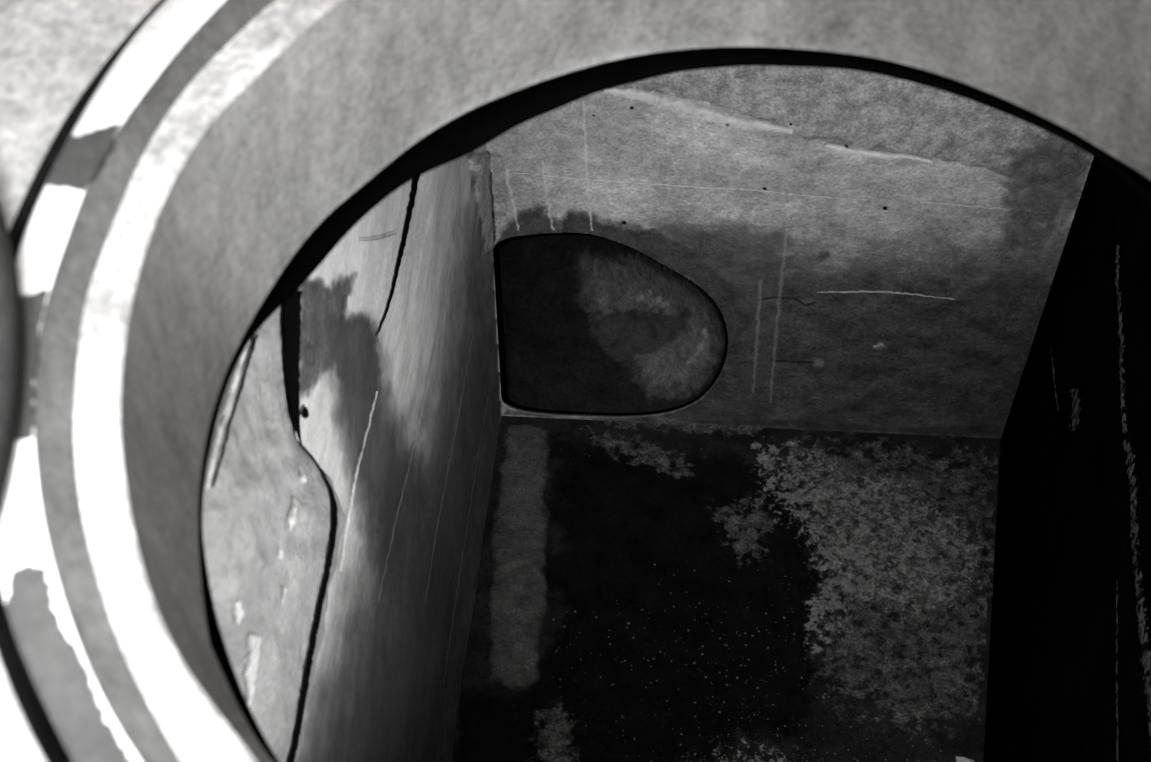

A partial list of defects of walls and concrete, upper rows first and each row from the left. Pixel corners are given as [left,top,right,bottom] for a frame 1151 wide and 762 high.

crack [359,176,420,337]
peeling [208,349,248,488]
water stain [299,207,1059,762]
peeling [236,602,245,624]
peeling [246,635,261,707]